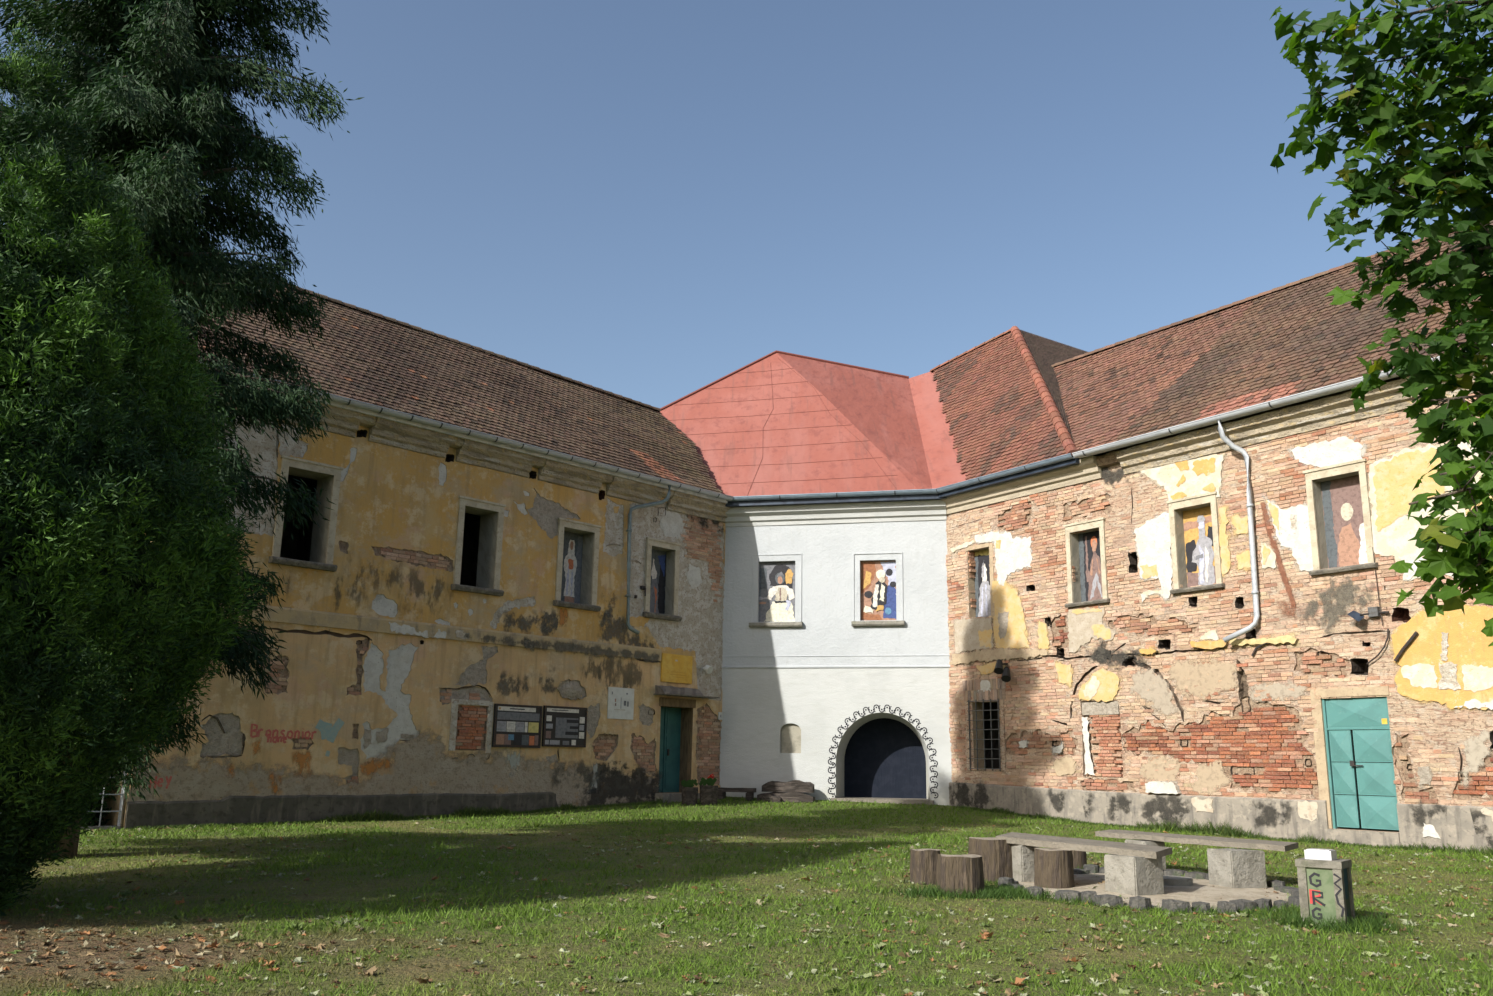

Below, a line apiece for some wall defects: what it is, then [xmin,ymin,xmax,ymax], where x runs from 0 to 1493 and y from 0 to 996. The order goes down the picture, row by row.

peeling [1288,434,1493,581]
crack [269,607,372,641]
peeling [337,594,536,786]
spalling [592,490,725,785]
spalling [949,454,1371,821]
peeling [1390,604,1493,710]
water stain [126,733,661,807]
water stain [1049,789,1064,812]
water stain [1109,795,1189,827]
water stain [1255,802,1290,826]
water stain [1411,802,1445,826]
spalling [1392,730,1493,821]